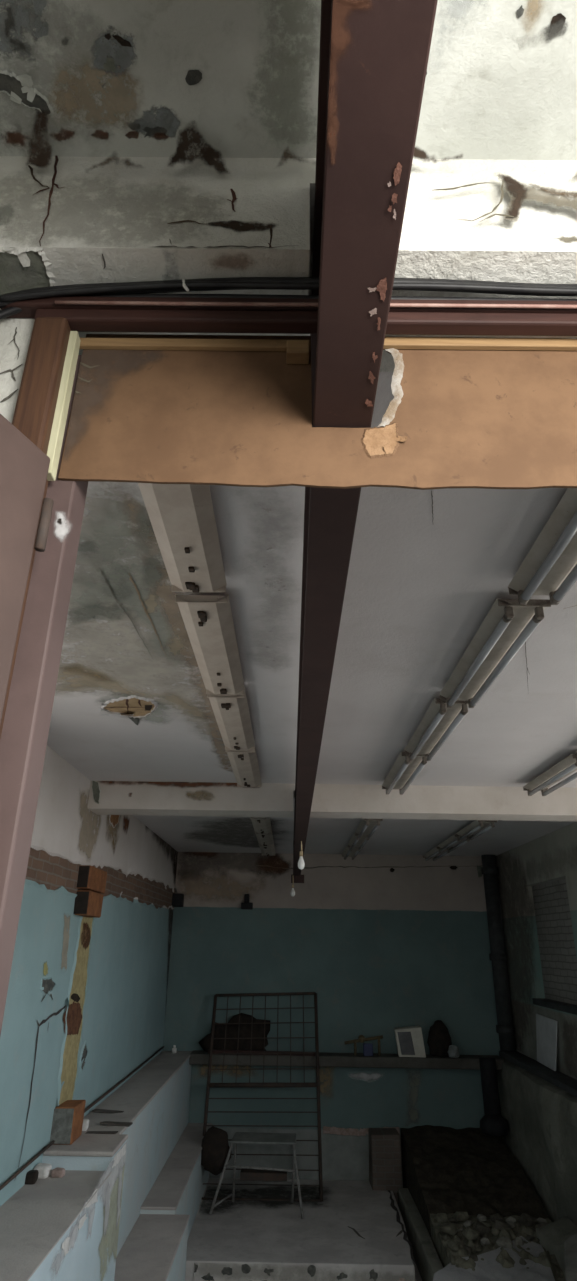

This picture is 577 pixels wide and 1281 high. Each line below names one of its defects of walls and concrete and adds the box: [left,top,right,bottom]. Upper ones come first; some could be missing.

spalling [185,70,202,85]
rust [327,0,371,164]
spalling [127,107,180,138]
crack [33,155,64,286]
crack [155,239,298,248]
crack [227,189,238,212]
peeling [368,278,387,331]
crack [0,327,22,403]
leakage [56,493,232,771]
spalling [99,695,160,725]
flaking render [25,845,177,911]
leakage [146,819,289,900]